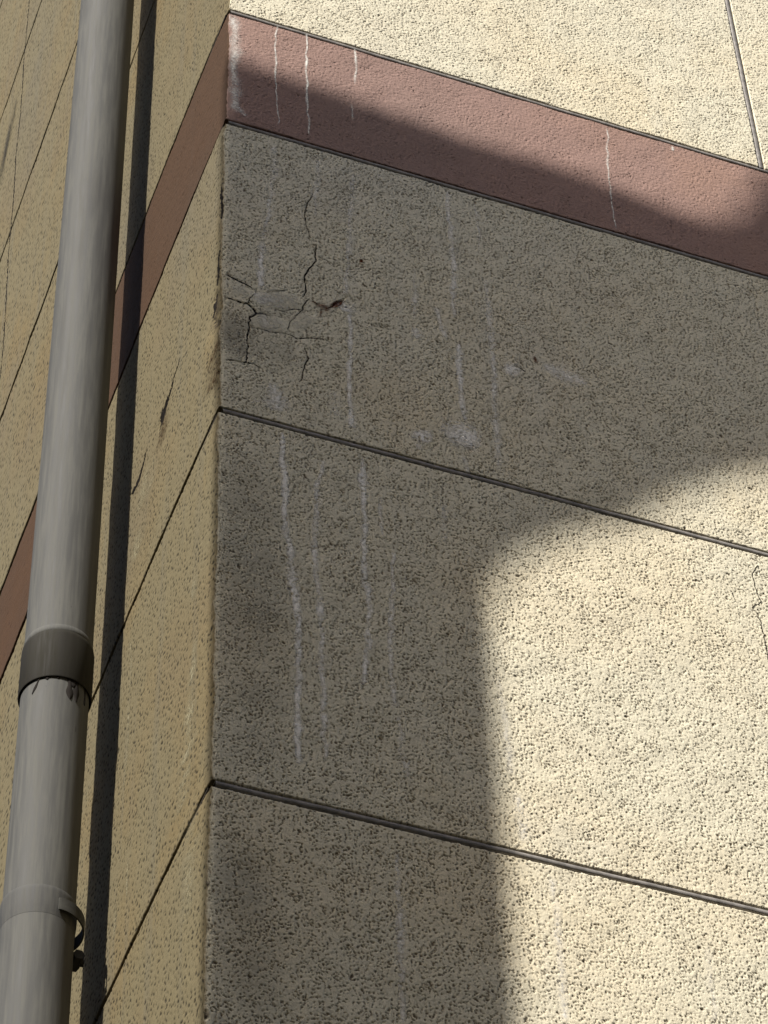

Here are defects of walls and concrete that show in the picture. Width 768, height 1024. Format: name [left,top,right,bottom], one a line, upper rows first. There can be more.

crack [218,187,226,219]
crack [213,194,326,382]
crack [131,449,147,494]
water stain [279,434,303,762]
water stain [312,461,328,756]
water stain [358,462,383,683]